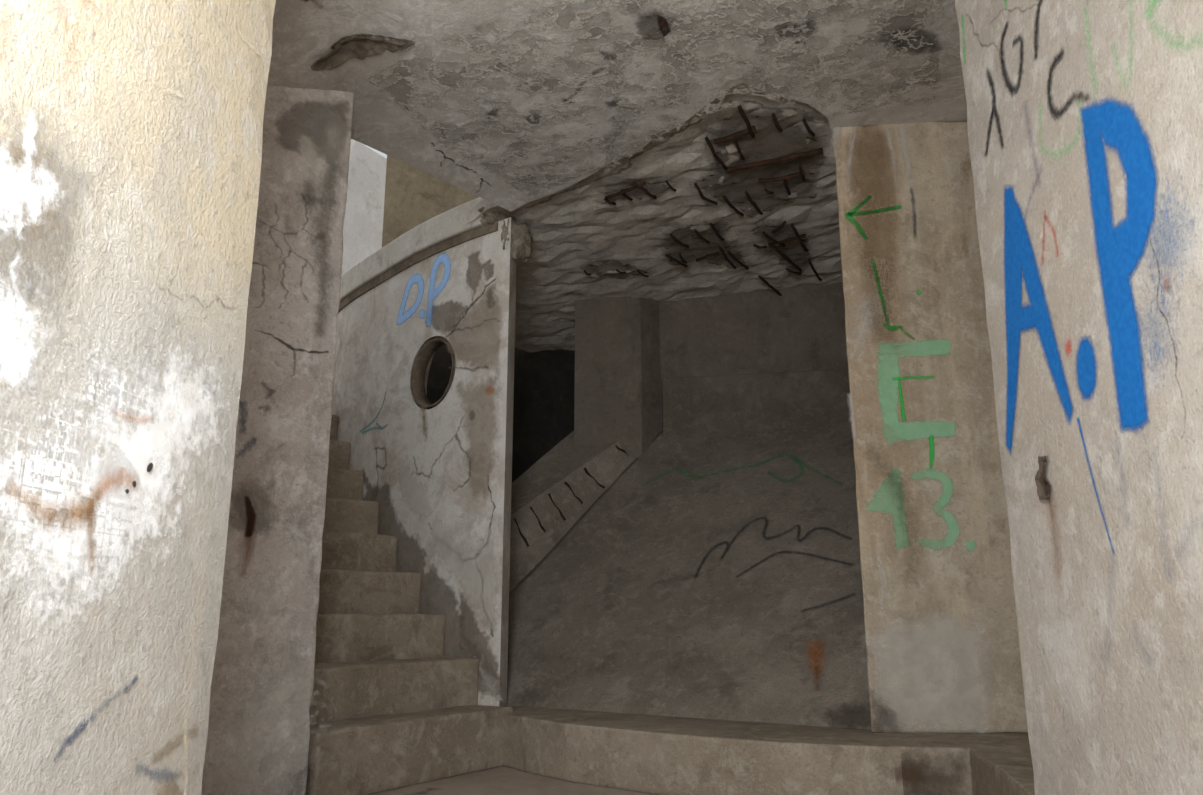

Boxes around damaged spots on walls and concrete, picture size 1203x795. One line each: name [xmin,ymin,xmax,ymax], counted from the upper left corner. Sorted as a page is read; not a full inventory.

spalling [311,34,415,71]
spalling [694,183,763,217]
spalling [665,223,782,296]
spalling [753,221,822,281]
crack [447,279,496,337]
crack [264,333,328,353]
water stain [0,331,228,623]
rust [35,492,99,550]
water stain [363,472,500,697]